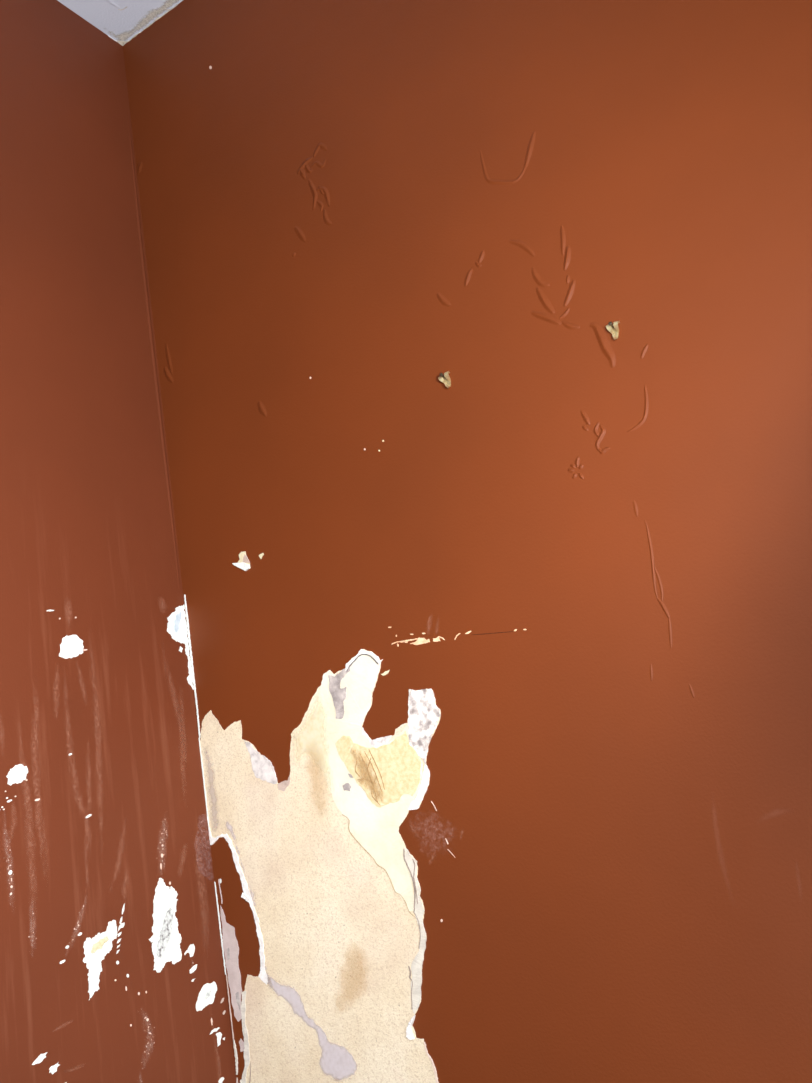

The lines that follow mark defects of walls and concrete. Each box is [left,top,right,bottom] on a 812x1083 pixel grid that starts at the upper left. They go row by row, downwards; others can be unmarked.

peeling [232,551,264,571]
peeling [59,635,88,659]
peeling [167,605,194,690]
peeling [148,649,441,1083]
peeling [78,903,125,1000]
peeling [32,1052,59,1074]